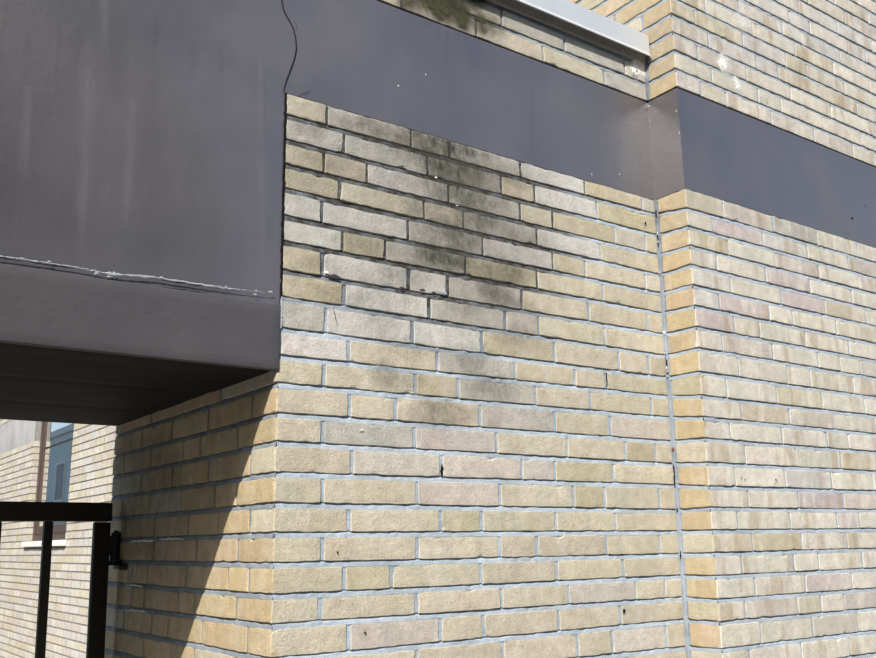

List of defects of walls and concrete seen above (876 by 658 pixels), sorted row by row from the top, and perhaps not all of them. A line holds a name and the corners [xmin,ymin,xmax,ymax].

leakage [400,0,492,31]
crack [280,0,309,301]
leakage [392,130,489,226]